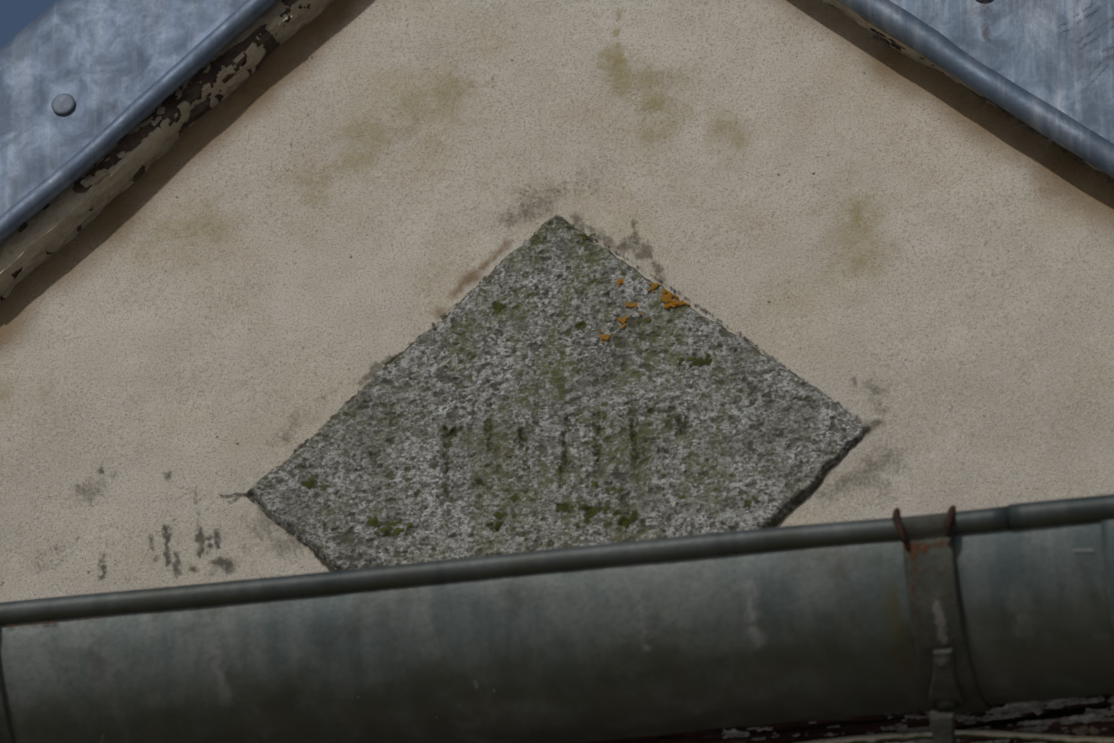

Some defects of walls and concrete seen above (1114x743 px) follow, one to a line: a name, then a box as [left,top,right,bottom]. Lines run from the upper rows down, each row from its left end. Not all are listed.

peeling [80,169,113,188]
leakage [0,0,353,343]
leakage [150,525,232,574]
peeling [722,727,772,739]
peeling [955,694,1114,736]